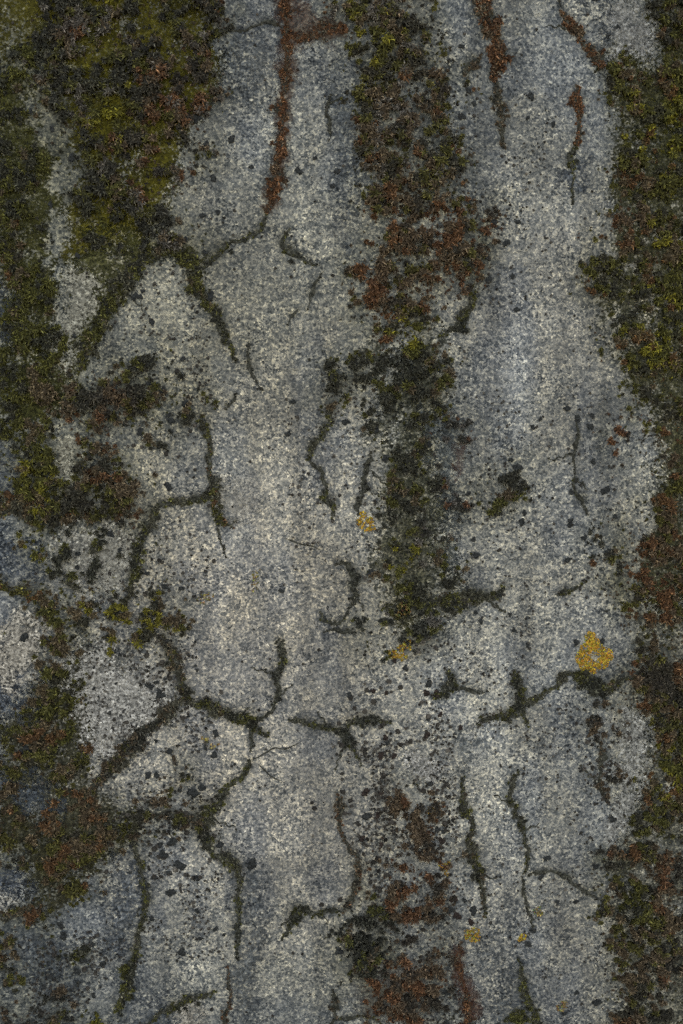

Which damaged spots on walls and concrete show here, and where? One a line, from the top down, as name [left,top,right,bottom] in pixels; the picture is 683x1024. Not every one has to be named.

crack [462,0,516,150]
crack [545,0,606,205]
crack [0,0,348,586]
crack [439,290,477,338]
crack [306,403,389,520]
water stain [419,397,470,576]
crack [547,422,589,516]
crack [286,538,506,636]
crack [432,668,643,728]
crack [88,634,392,1024]
crack [457,769,604,928]
crack [504,957,543,1024]